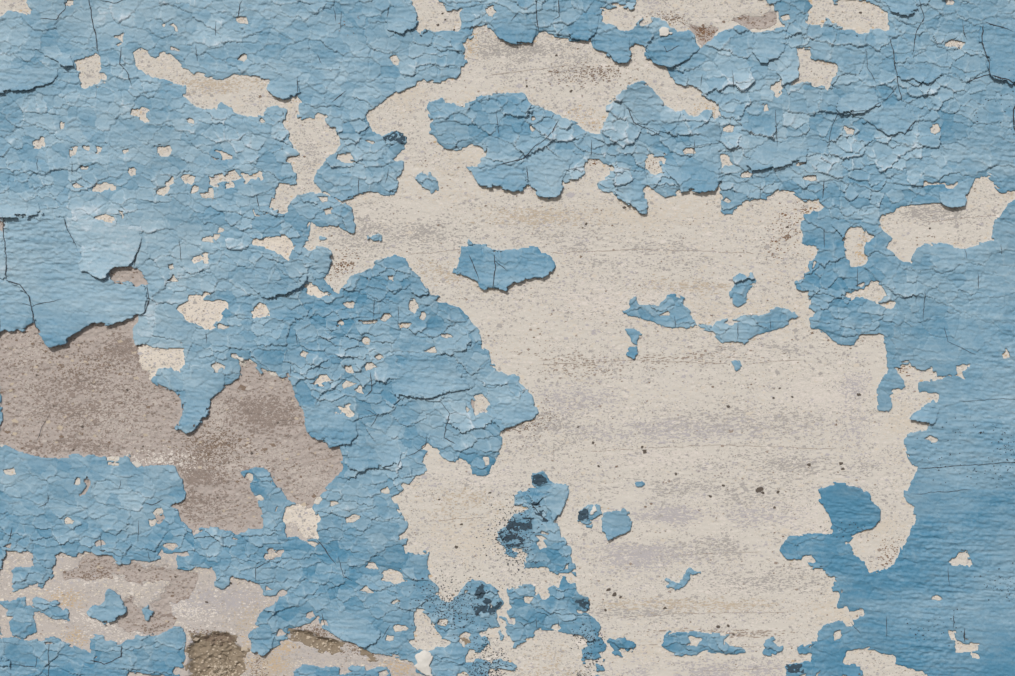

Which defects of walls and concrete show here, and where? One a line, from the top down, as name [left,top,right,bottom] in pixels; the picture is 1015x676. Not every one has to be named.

peeling [69,145,102,158]
crack [42,0,131,83]
peeling [130,107,149,123]
peeling [133,46,355,217]
crack [829,3,924,144]
crack [962,21,1015,130]
crack [3,220,61,331]
flaking render [0,197,358,548]
peeling [243,0,972,676]
flaking render [63,553,198,638]
peeling [948,630,980,659]